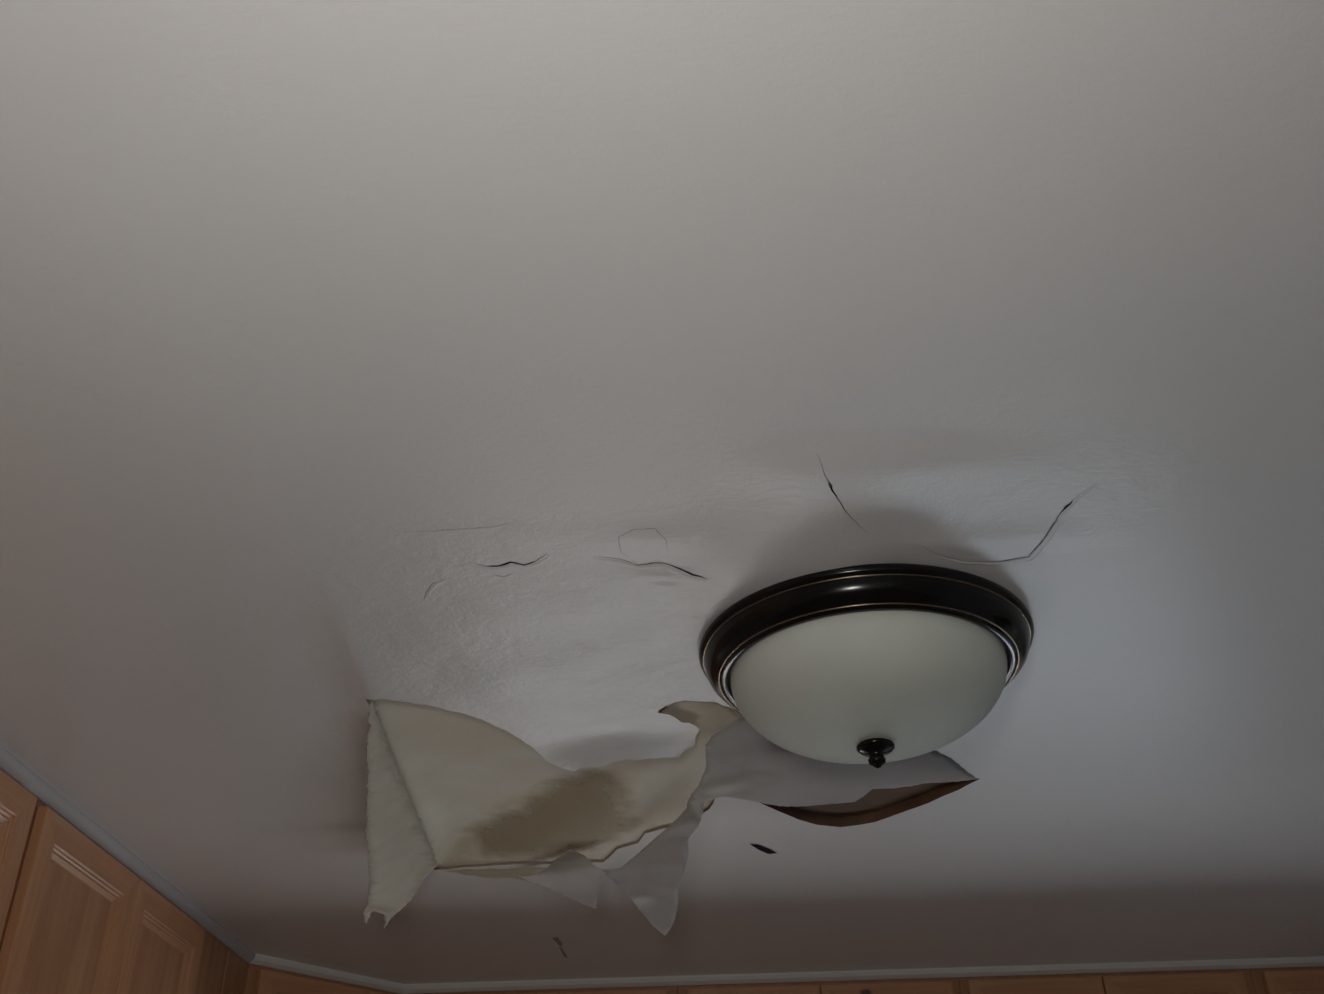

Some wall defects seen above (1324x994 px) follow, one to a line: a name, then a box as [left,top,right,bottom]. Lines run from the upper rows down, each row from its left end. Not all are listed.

crack [423,555,552,603]
crack [598,528,708,582]
crack [819,459,862,528]
crack [915,485,1097,566]
peeling [363,699,976,935]